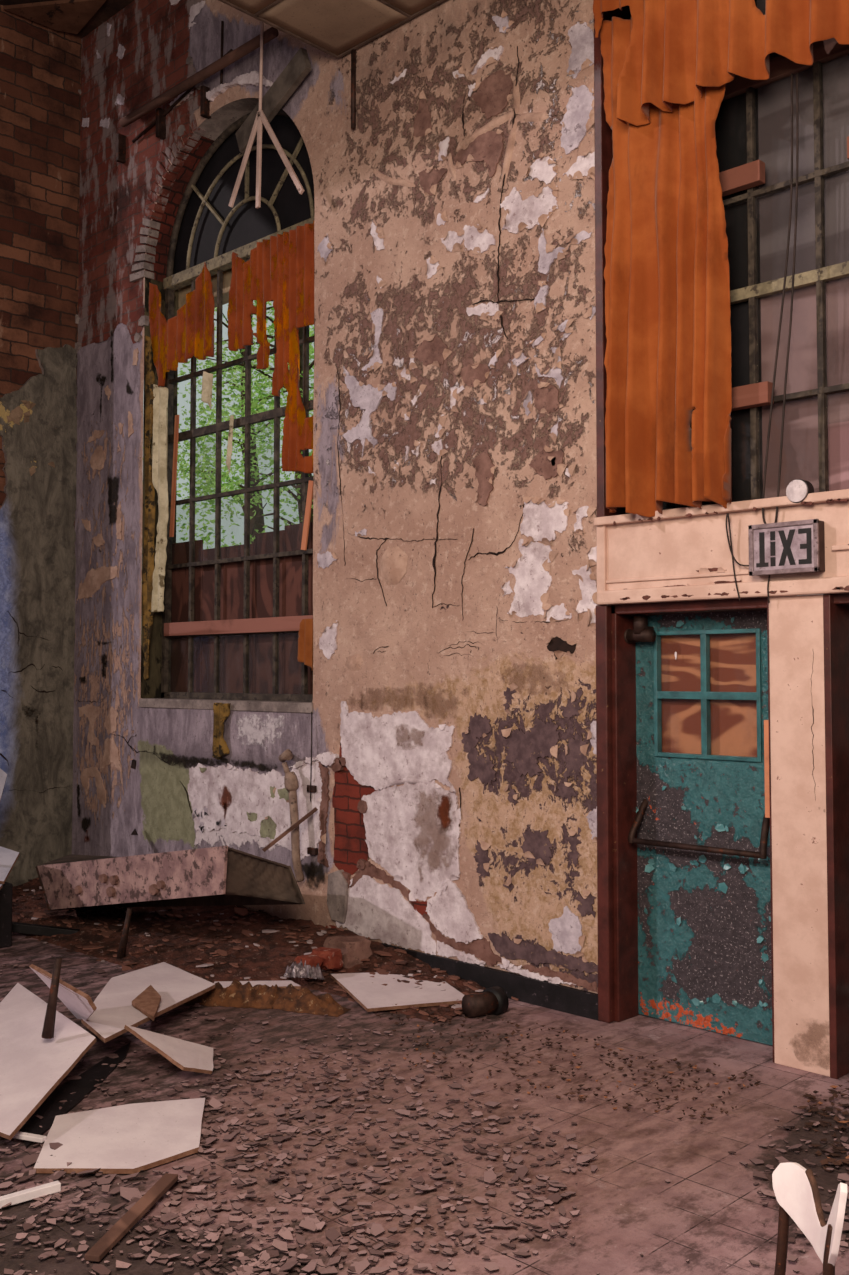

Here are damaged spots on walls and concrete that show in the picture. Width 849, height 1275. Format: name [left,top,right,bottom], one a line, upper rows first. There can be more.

spalling [0,0,273,398]
peeling [370,219,385,251]
crack [337,369,569,653]
peeling [410,10,514,203]
peeling [339,306,596,483]
peeling [471,452,495,506]
peeling [466,302,503,321]
crack [472,174,535,339]
peeling [425,19,595,314]
crack [512,46,564,128]
peeling [500,496,598,660]
peeling [12,682,598,1022]